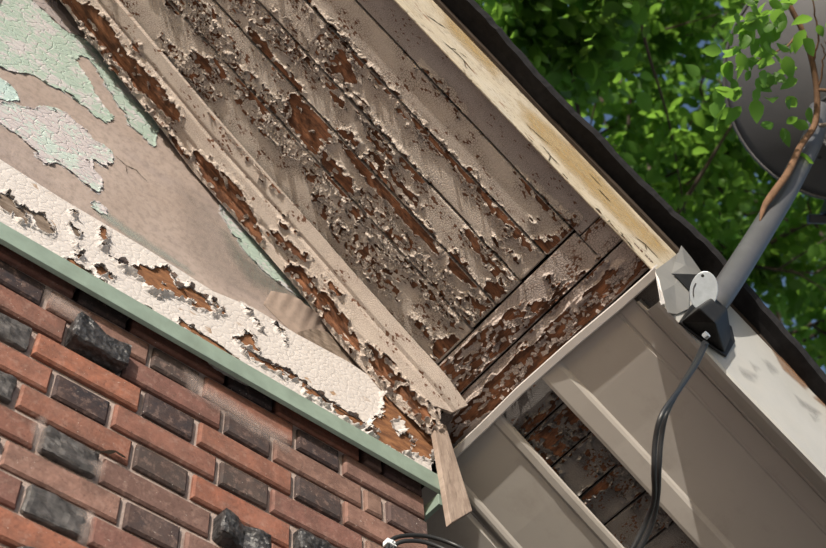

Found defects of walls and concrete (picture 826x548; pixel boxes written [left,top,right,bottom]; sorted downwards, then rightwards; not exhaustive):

peeling [0,0,653,465]
peeling [516,390,673,532]